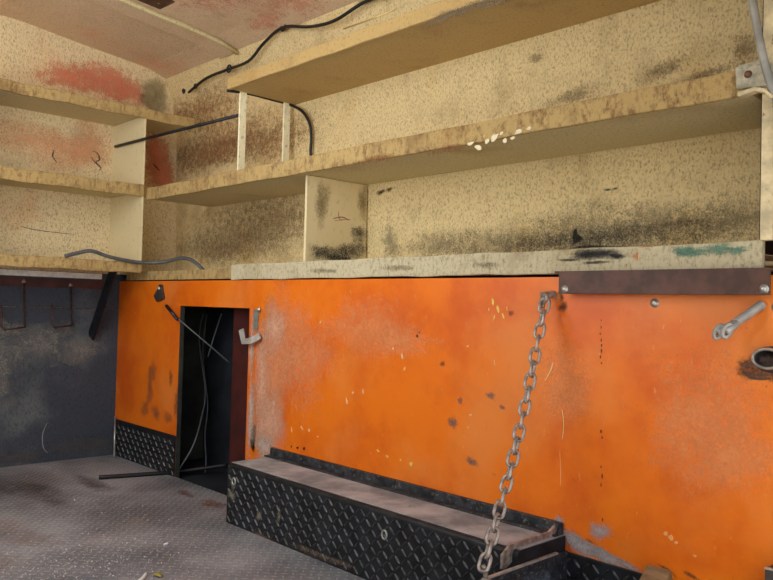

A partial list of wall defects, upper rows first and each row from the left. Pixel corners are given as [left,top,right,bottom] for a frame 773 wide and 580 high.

rust [738,356,773,380]